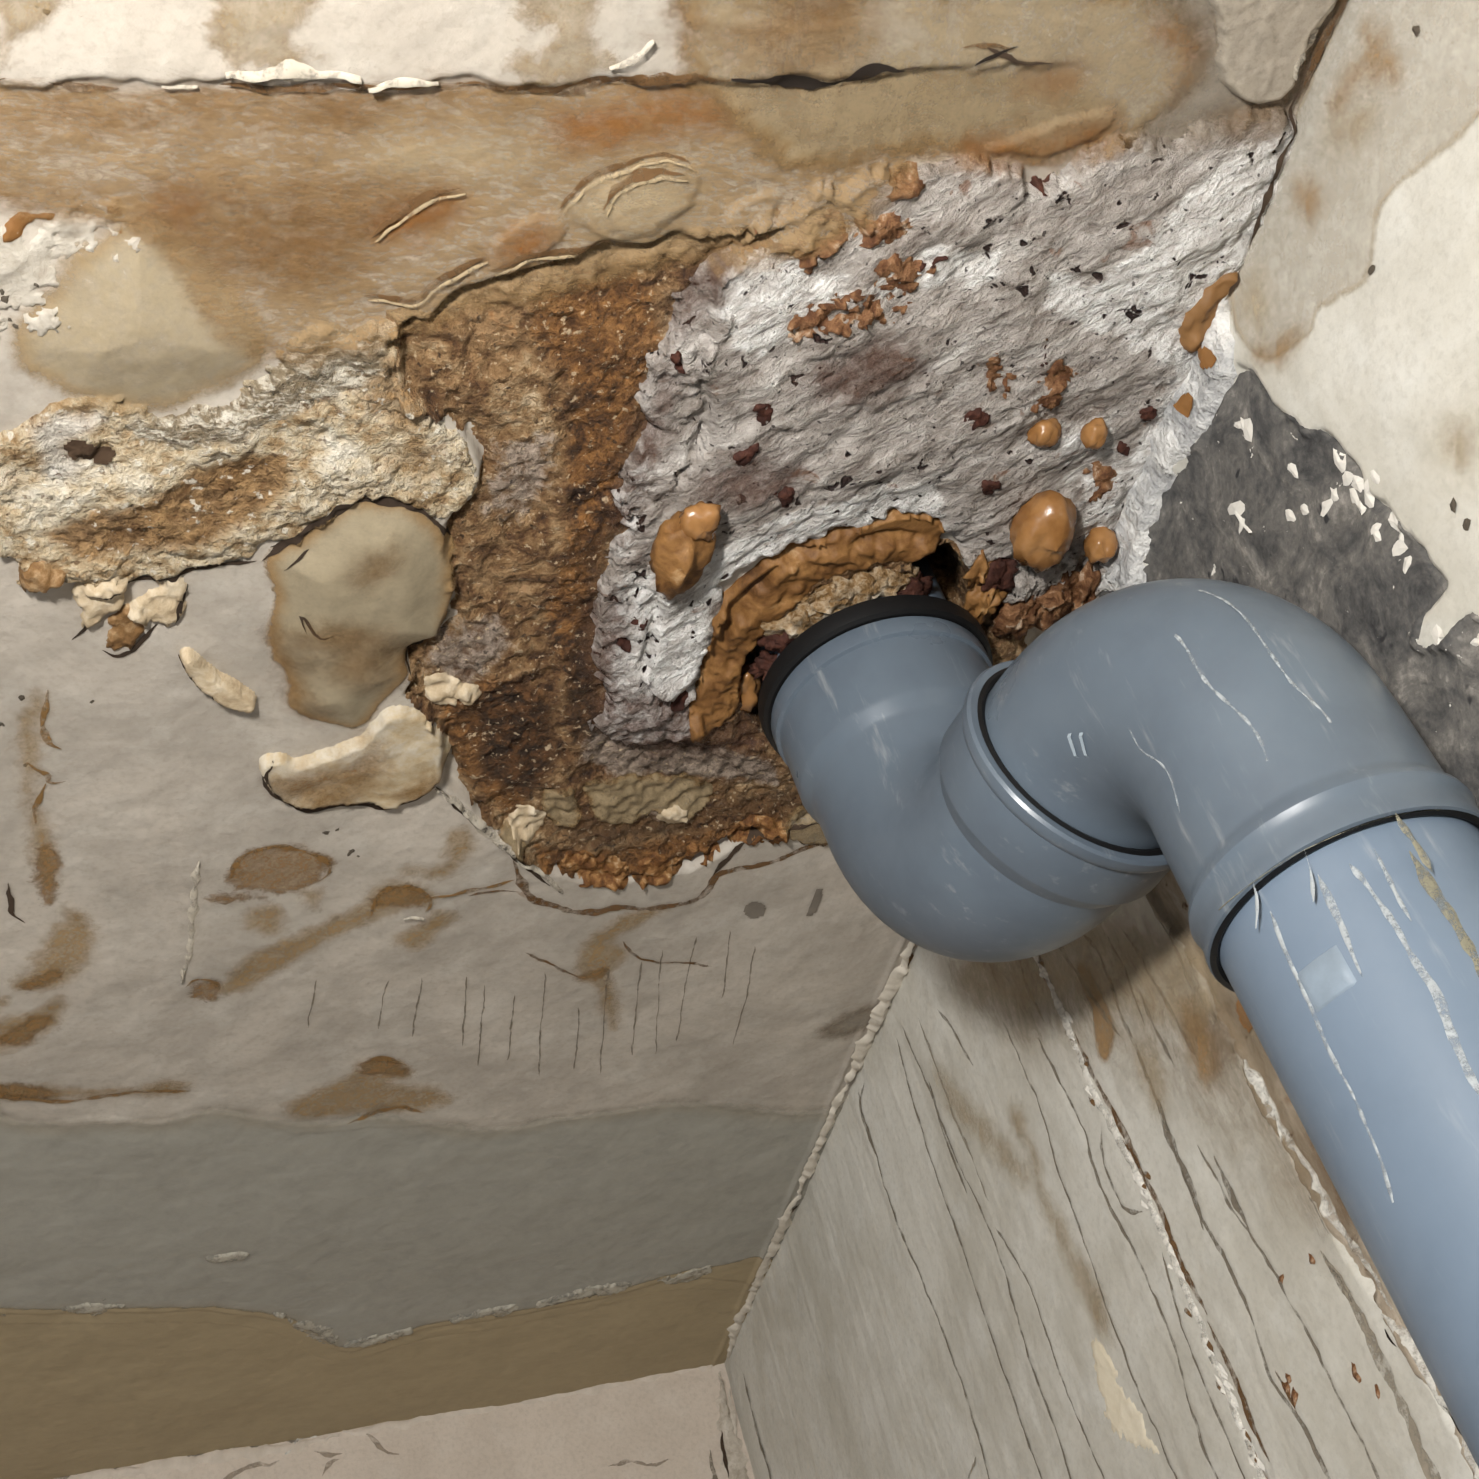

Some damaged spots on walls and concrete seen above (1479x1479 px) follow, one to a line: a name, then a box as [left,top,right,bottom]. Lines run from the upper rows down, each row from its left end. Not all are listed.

crack [51,82,119,93]
crack [162,39,923,94]
peeling [1209,0,1337,104]
damp [0,0,1344,753]
flaking render [0,227,827,892]
flaking render [788,538,973,611]
flaking render [981,616,1027,665]
peeling [1143,368,1479,809]
flaking render [0,1257,772,1479]
crack [1009,935,1376,1479]
crack [1244,1059,1479,1479]